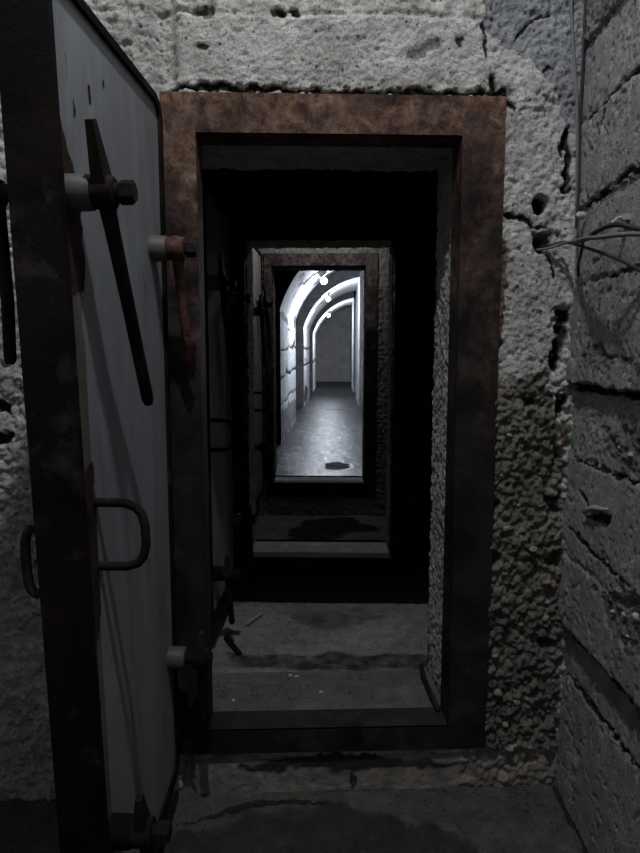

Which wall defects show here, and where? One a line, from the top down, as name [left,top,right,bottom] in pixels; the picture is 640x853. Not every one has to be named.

leakage [288,517,378,540]